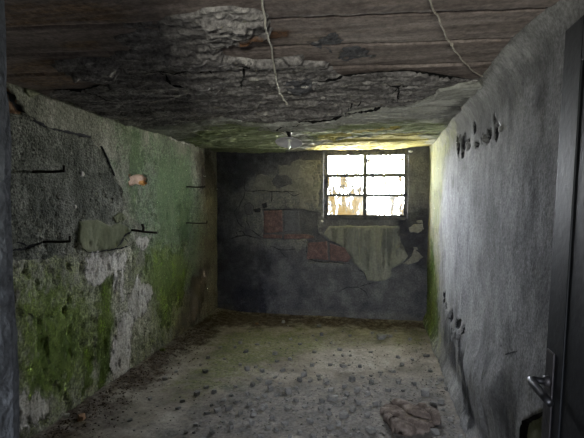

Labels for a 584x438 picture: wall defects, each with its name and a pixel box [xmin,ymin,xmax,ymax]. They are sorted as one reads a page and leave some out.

peeling [48,6,482,152]
spalling [457,114,502,159]
spalling [128,174,147,187]
crack [13,242,43,251]
crack [228,190,371,298]
peeling [252,159,424,282]
peeling [85,251,153,380]
spalling [445,310,465,341]
water stain [81,343,111,395]